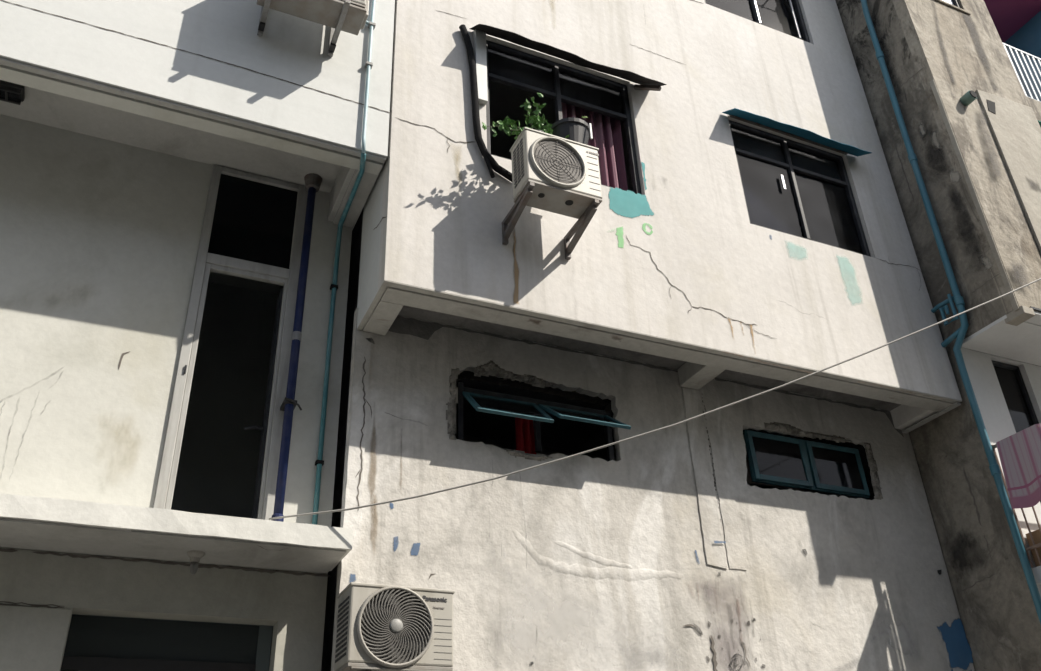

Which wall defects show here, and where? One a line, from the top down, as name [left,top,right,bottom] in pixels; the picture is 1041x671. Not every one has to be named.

crack [2,0,474,153]
leakage [871,13,898,86]
leakage [963,14,989,69]
leakage [920,125,991,269]
crack [626,236,777,339]
crack [356,357,372,510]
flaking render [446,368,459,440]
flaking render [474,360,554,388]
flaking render [505,449,552,461]
flaking render [764,422,883,500]